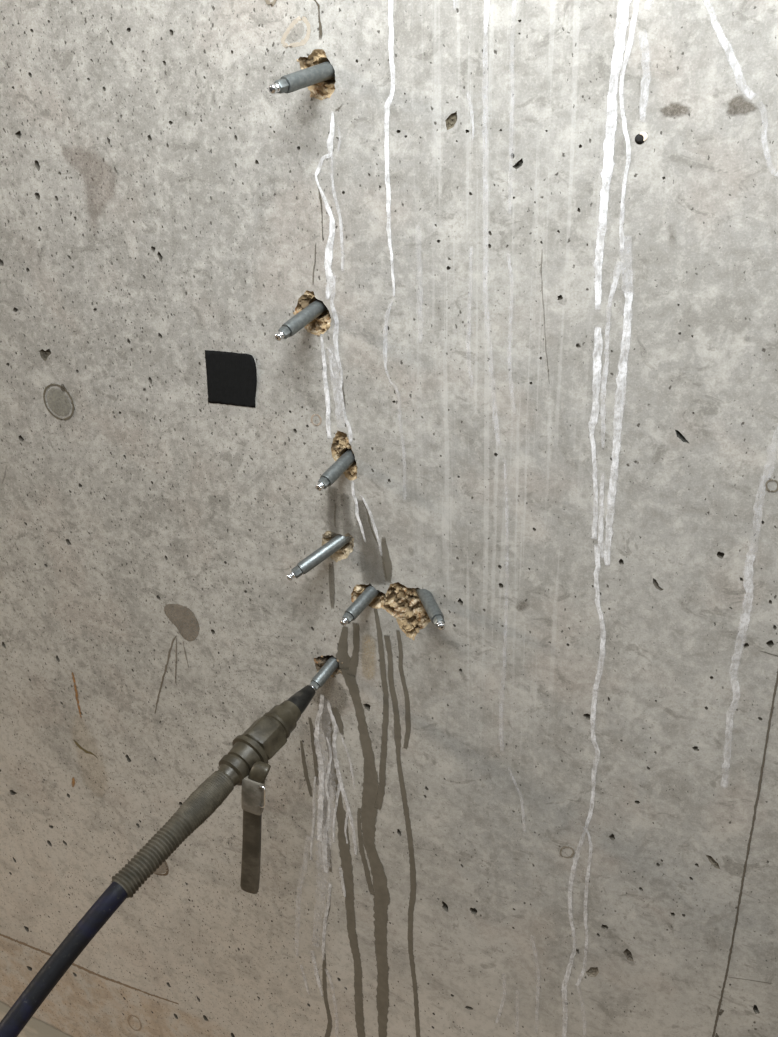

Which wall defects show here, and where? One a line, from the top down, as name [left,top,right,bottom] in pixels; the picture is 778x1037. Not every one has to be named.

crack [314,0,323,38]
efflorescence [711,21,741,74]
efflorescence [384,0,395,295]
damp [728,91,755,114]
crack [313,186,323,283]
crack [362,500,387,579]
efflorescence [561,0,639,1037]
efflorescence [738,556,755,634]
damp [300,609,420,1037]
crack [712,652,778,1037]